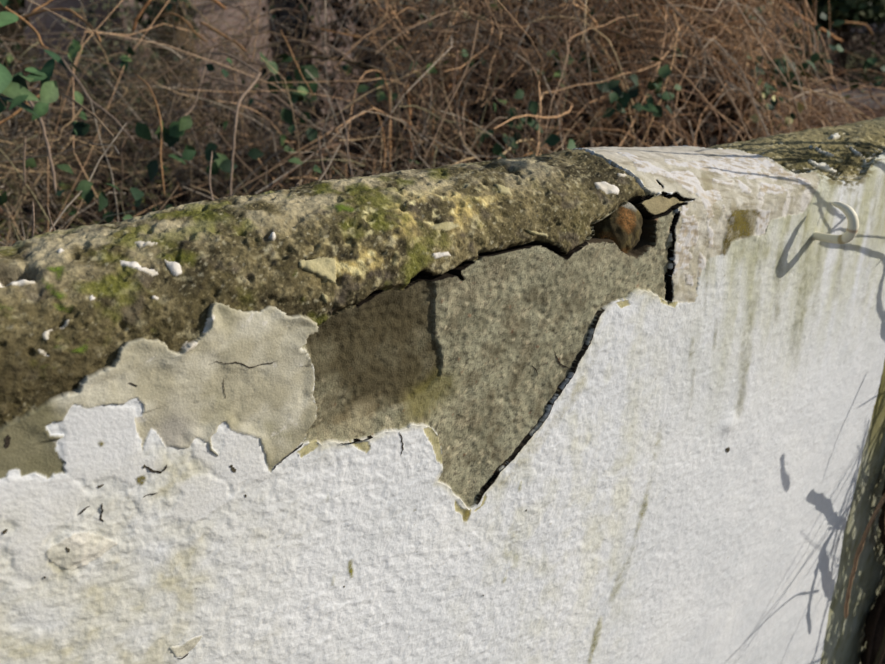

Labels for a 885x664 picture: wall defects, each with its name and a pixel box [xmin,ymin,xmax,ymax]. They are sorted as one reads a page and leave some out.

crack [356,289,383,307]
spalling [0,145,837,522]
crack [405,240,587,289]
crack [628,180,694,302]
crack [480,310,605,501]